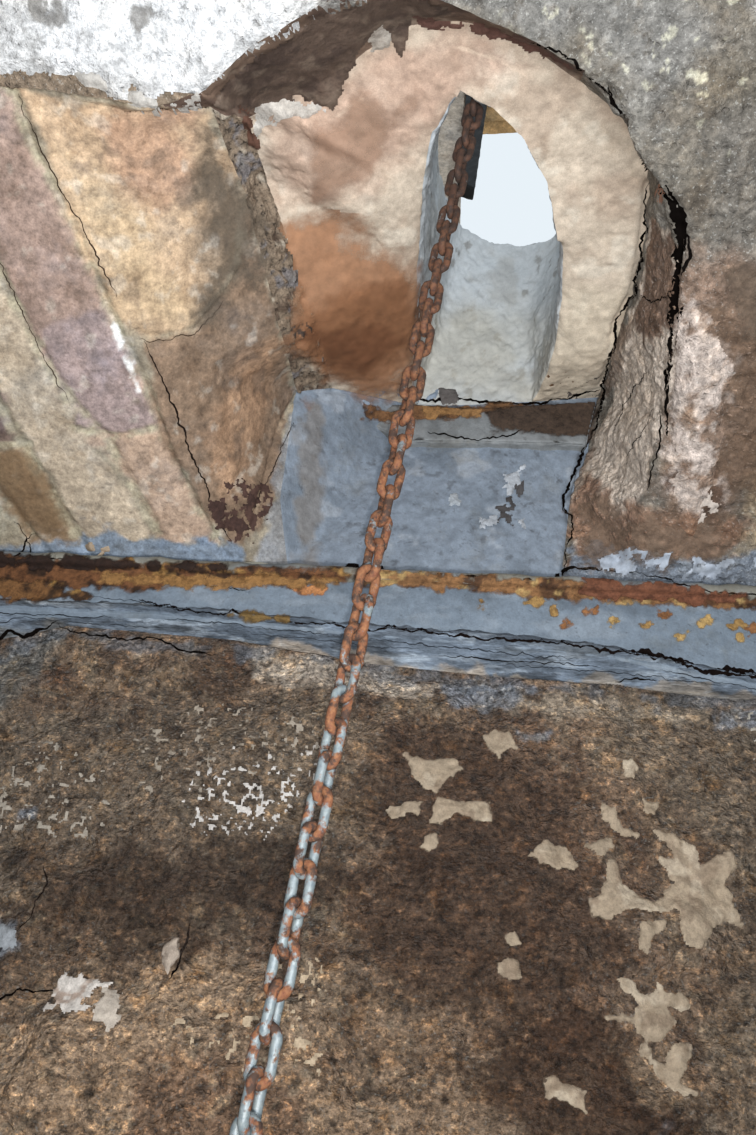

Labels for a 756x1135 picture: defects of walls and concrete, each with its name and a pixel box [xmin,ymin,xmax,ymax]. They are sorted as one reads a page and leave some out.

water stain [28,0,65,24]
water stain [130,6,156,31]
crack [533,43,623,114]
crack [0,263,68,399]
crack [420,158,756,595]
corrosion [0,551,756,642]
crack [0,585,756,690]
spalling [385,751,493,852]
spalling [527,802,744,954]
spalling [42,971,123,1032]
spalling [604,977,699,1097]
spalling [544,1075,588,1114]